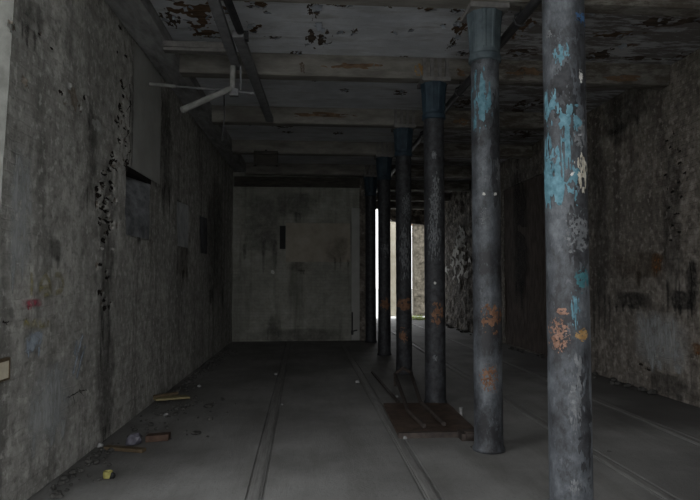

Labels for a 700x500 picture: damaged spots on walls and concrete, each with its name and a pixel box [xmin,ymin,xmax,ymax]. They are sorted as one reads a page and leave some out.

peeling [158,0,221,39]
peeling [290,4,358,73]
spalling [94,151,129,251]
peeling [439,9,700,329]
rust [380,297,411,311]
rust [548,308,588,354]